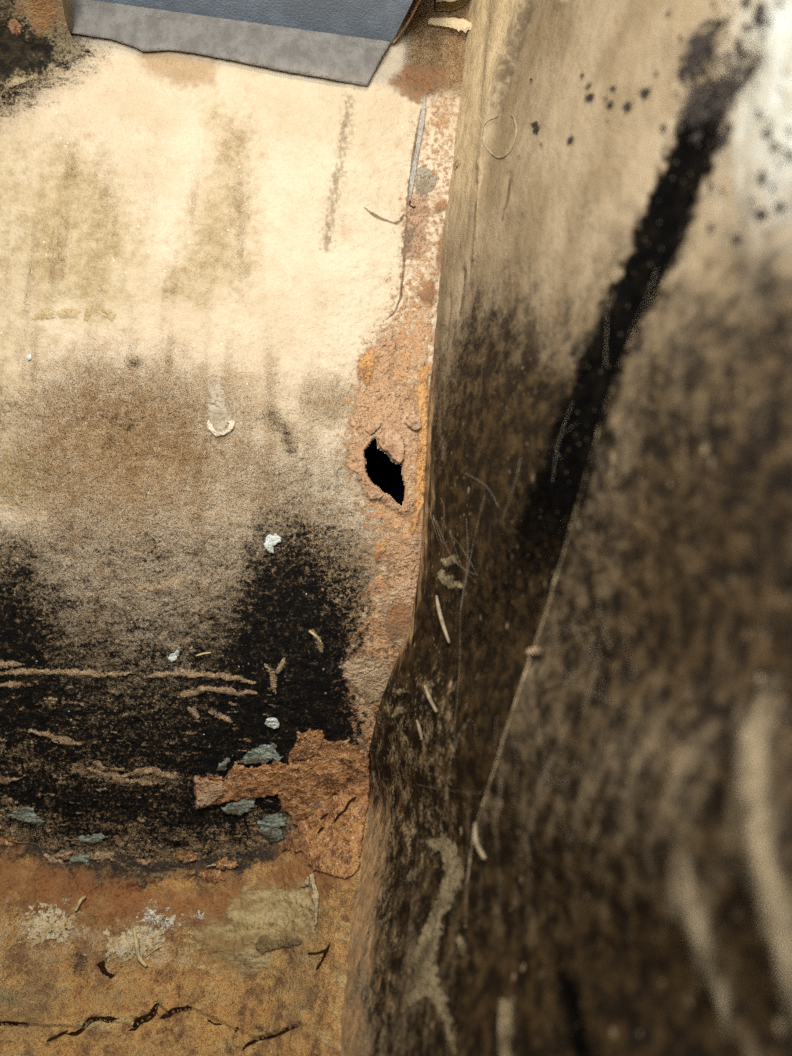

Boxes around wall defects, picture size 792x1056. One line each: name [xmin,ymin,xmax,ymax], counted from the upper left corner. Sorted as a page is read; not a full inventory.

rust [8,19,22,34]
leakage [480,0,784,615]
spalling [364,417,422,506]
rust [0,63,461,931]
peeling [265,717,280,729]
peeling [216,743,284,771]
peeling [221,798,288,843]
leakage [17,898,85,953]
leakage [101,899,205,969]
rust [97,960,115,978]
crack [0,1019,27,1027]
crack [46,1003,298,1051]